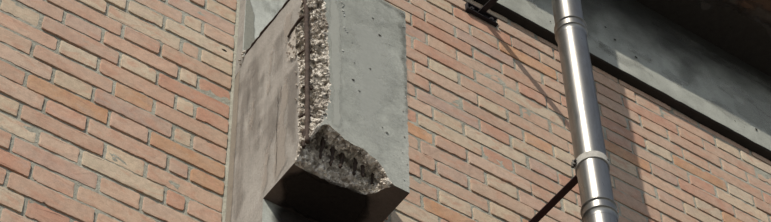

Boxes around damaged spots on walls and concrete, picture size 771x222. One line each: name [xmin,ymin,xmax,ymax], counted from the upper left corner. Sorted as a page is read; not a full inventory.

spalling [238,0,290,65]
leakage [636,0,771,77]
spalling [286,0,395,194]